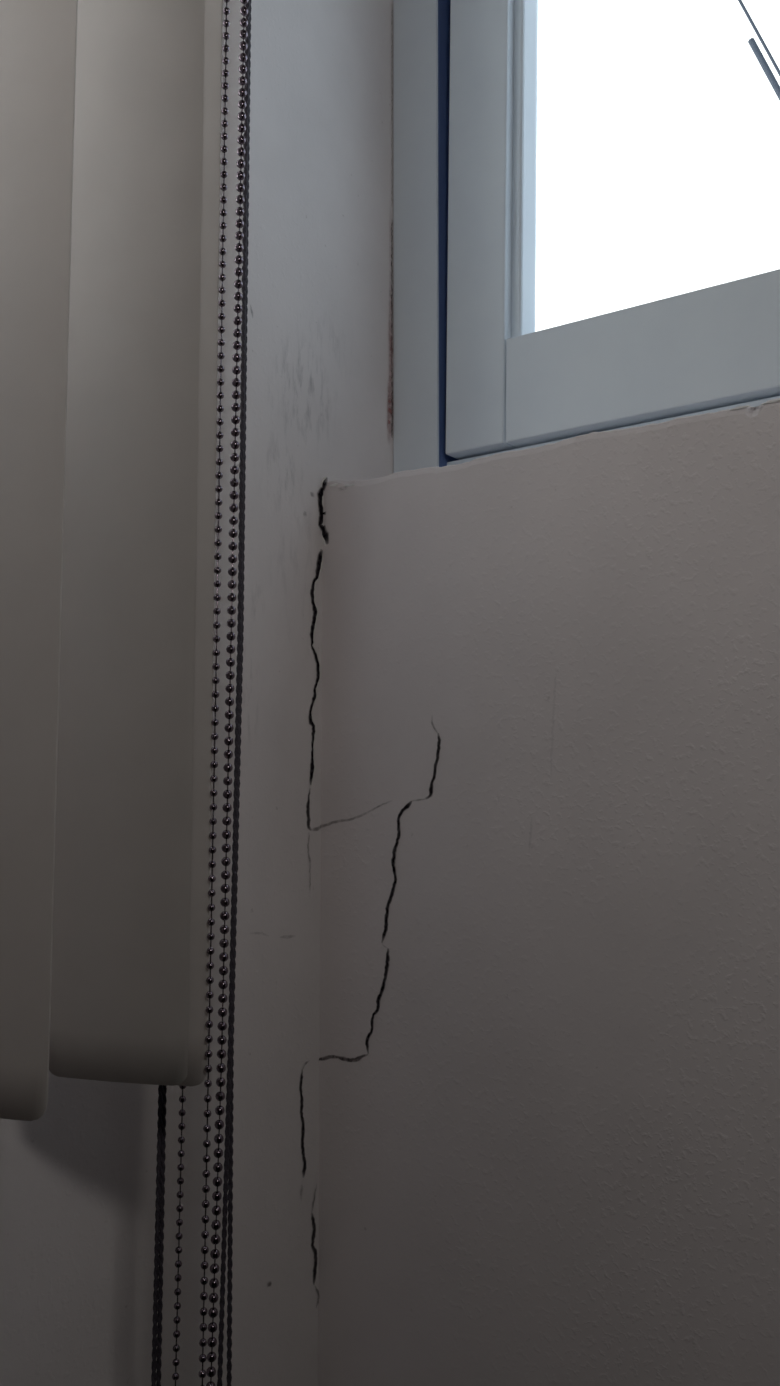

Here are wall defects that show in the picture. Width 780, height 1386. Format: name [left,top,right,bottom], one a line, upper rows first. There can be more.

crack [307,476,328,829]
crack [300,736,441,1175]
crack [311,1216,319,1294]